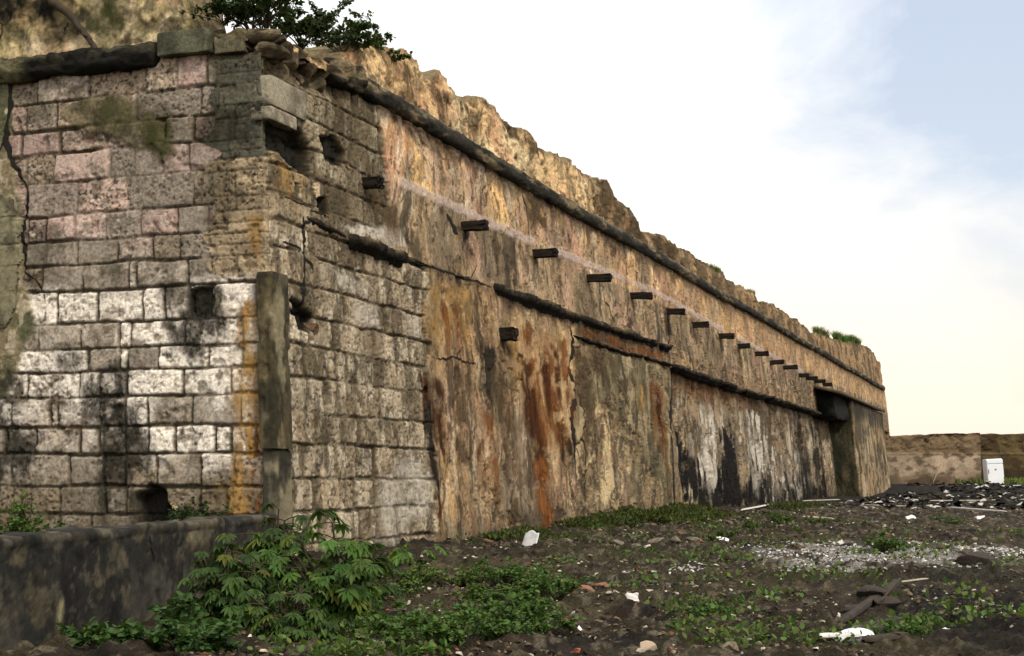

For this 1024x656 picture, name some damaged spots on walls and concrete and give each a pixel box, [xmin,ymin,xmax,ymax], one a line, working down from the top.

crack [0,84,45,299]
crack [281,194,328,305]
spalling [124,487,178,522]
water stain [167,287,226,358]
spalling [178,286,221,321]
corrosion [229,300,260,515]
corrosion [431,287,468,352]
crack [435,347,476,364]
corrosion [513,324,571,527]
crack [567,327,587,488]
corrosion [640,383,670,469]
water stain [675,401,827,508]